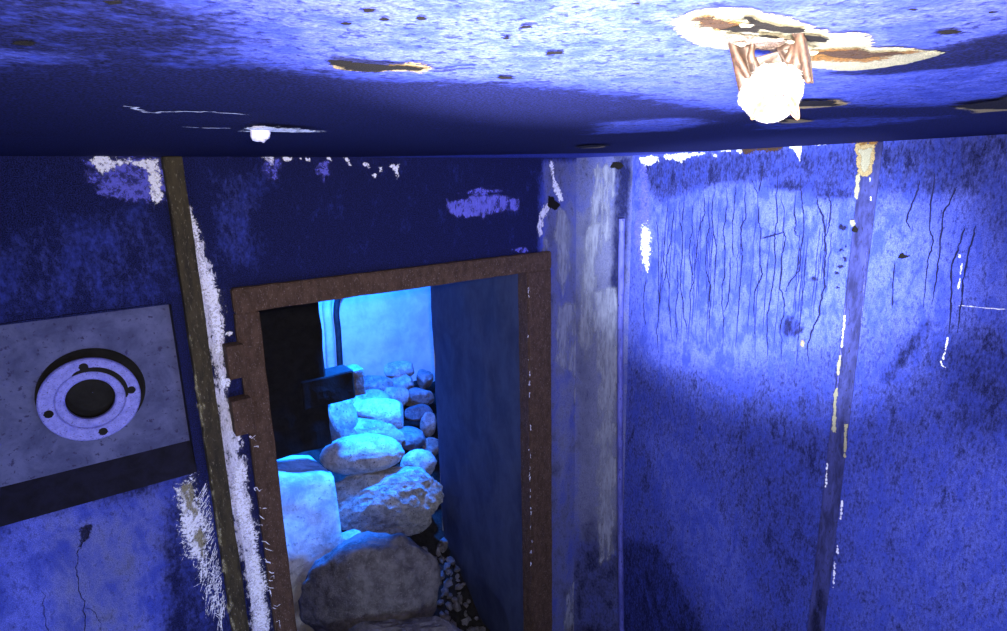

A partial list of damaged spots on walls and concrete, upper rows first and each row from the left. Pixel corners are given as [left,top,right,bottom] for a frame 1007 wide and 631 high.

spalling [326,59,475,74]
spalling [668,7,945,71]
spalling [776,100,850,124]
spalling [949,97,1007,113]
leakage [189,206,280,631]
leakage [173,469,235,630]